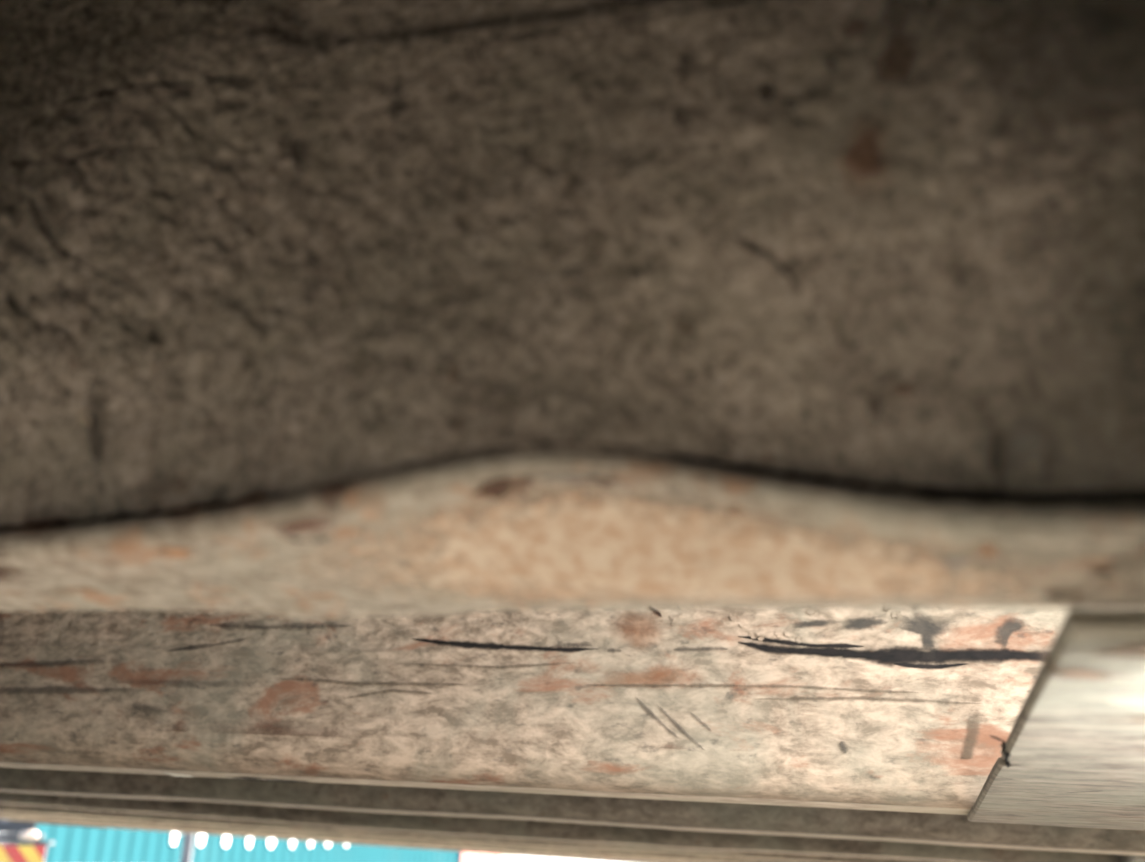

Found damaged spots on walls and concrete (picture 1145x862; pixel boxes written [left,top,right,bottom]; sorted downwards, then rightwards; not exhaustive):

crack [168,623,347,651]
crack [413,639,620,652]
crack [673,636,1048,669]